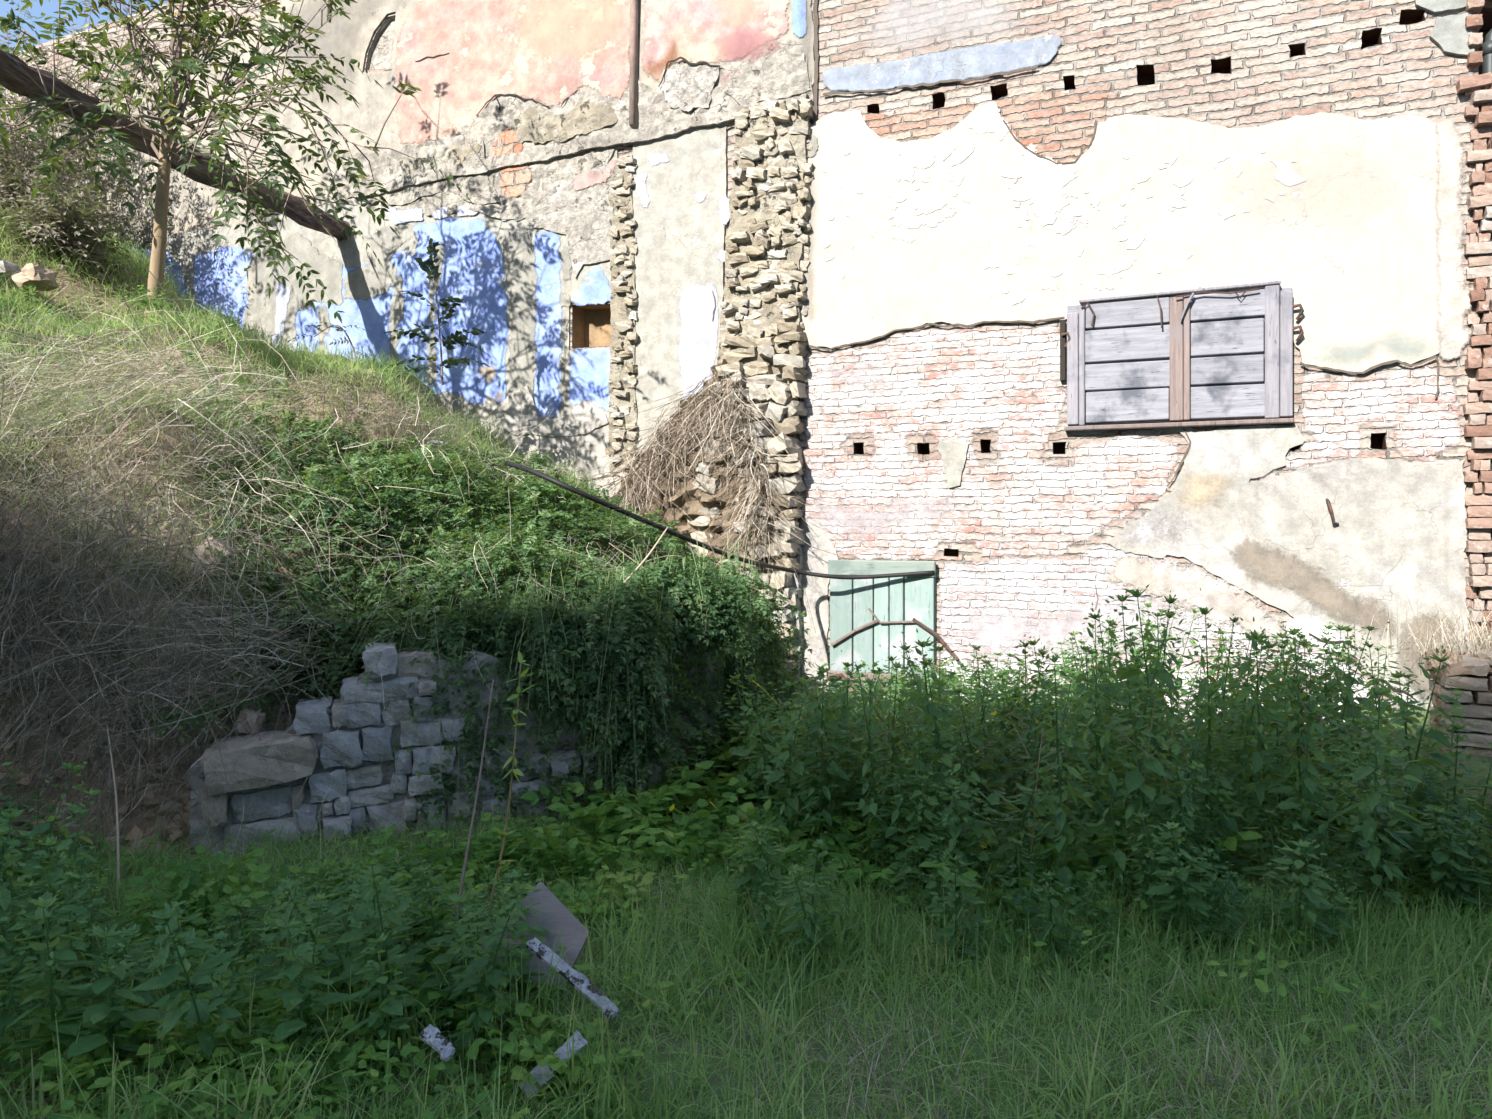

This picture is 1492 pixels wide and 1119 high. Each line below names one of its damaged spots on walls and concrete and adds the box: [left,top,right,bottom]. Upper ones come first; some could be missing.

peeling [1429,12,1475,57]
flaking render [662,52,810,112]
flaking render [864,102,975,142]
flaking render [991,91,1108,235]
flaking render [479,366,608,437]
flaking render [1285,365,1461,469]
flaking render [803,325,1397,722]